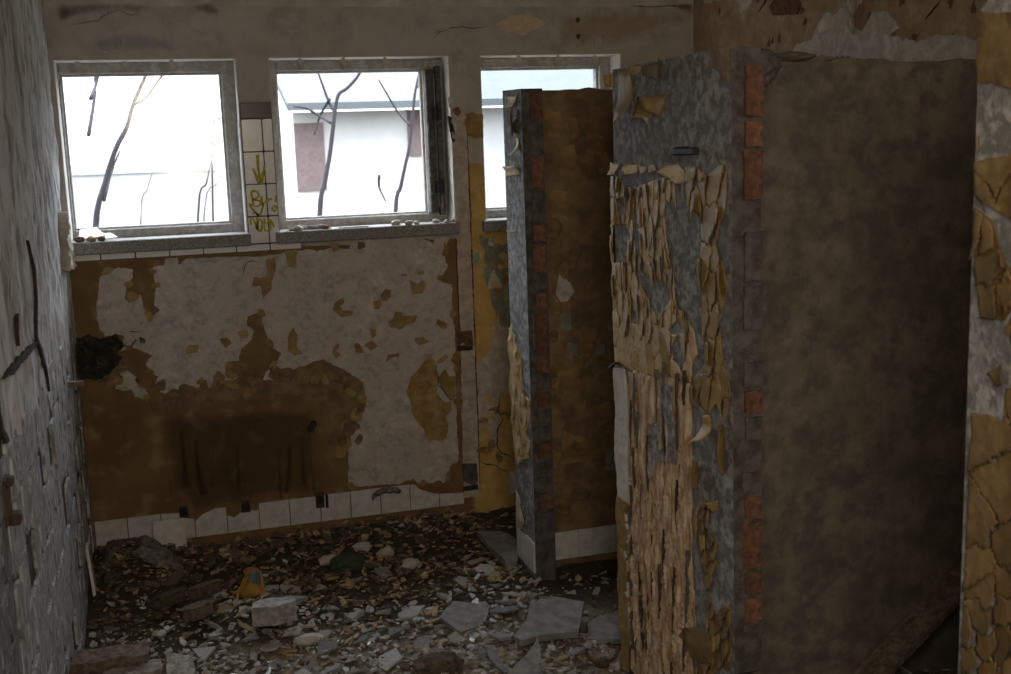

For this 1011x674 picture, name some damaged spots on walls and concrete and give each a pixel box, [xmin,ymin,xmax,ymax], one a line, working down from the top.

flaking render [529,90,542,120]
peeling [702,0,1011,88]
peeling [75,236,460,491]
peeling [516,491,524,529]
peeling [473,95,578,475]
flaking render [594,162,733,674]
peeling [960,364,1011,674]
peeling [968,136,1011,341]